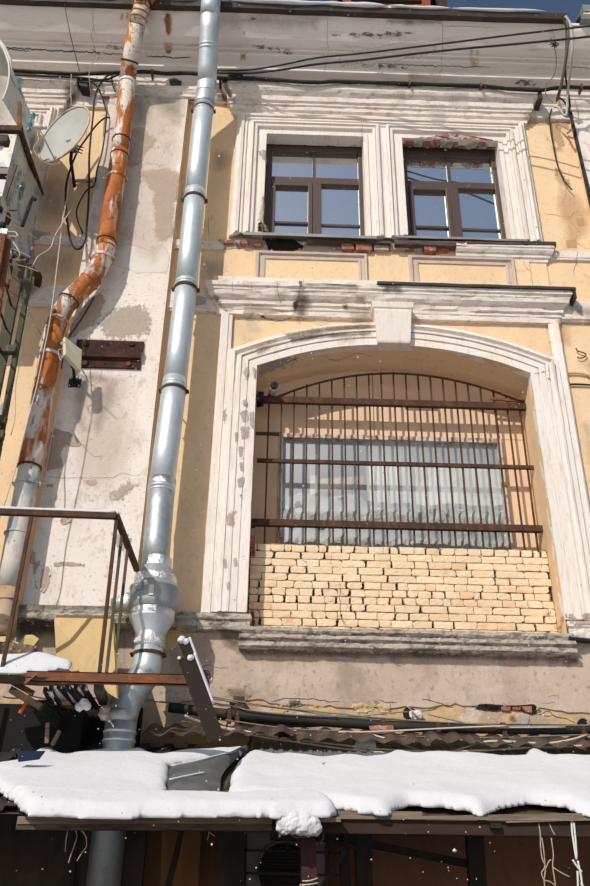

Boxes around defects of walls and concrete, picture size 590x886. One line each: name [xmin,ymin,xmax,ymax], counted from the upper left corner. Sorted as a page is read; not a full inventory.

spalling [218,196,455,256]
peeling [69,294,156,341]
leakage [296,294,308,314]
spalling [43,429,81,487]
crack [271,698,340,706]
spalling [475,704,540,724]